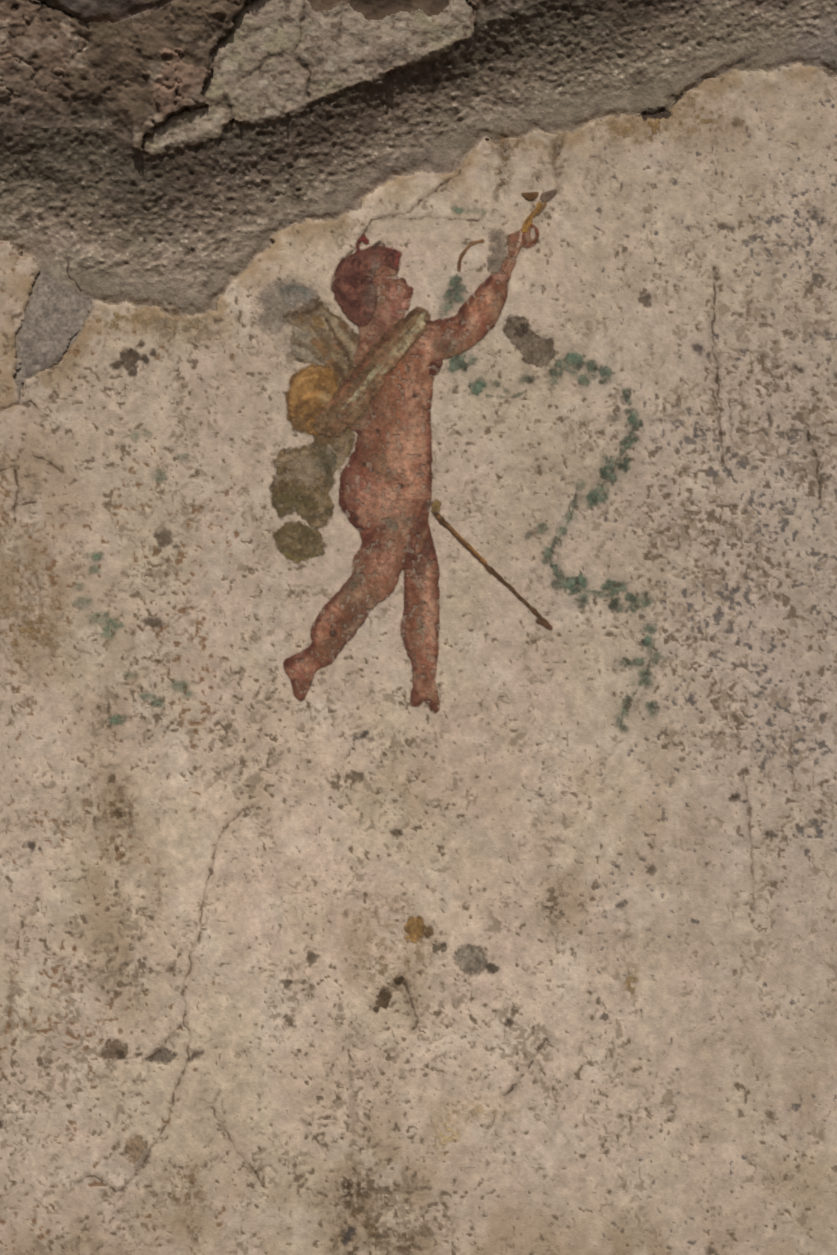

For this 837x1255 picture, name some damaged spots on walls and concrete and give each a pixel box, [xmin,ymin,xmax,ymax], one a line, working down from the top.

spalling [824,62,837,77]
spalling [639,108,671,120]
spalling [488,230,509,273]
spalling [257,281,306,333]
spalling [113,341,155,375]
spalling [503,316,555,367]
crack [78,806,254,1192]